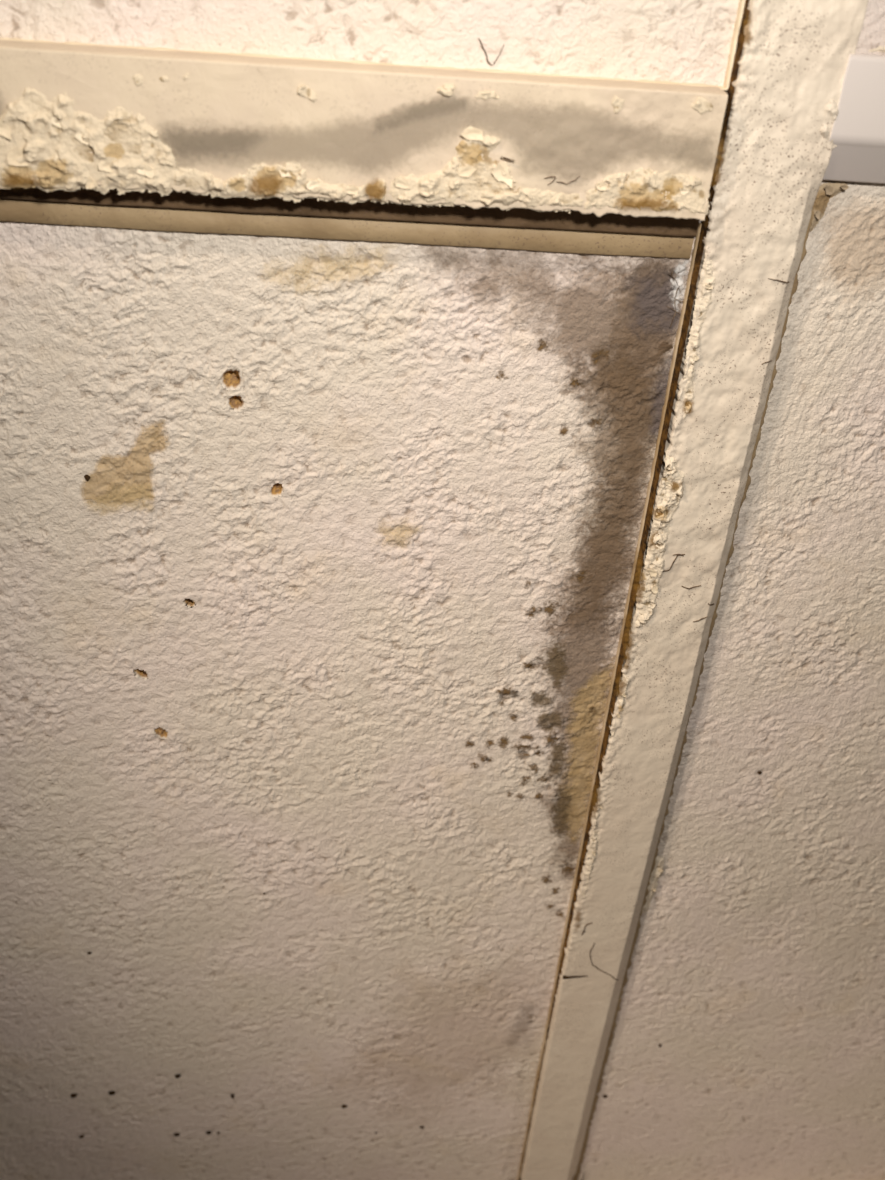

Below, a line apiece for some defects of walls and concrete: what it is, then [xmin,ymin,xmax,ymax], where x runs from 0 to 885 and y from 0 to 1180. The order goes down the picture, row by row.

crack [478,38,505,66]
peeling [0,88,710,216]
leakage [84,424,165,502]
leakage [466,261,688,917]
crack [519,0,751,1180]
spalling [633,450,685,628]